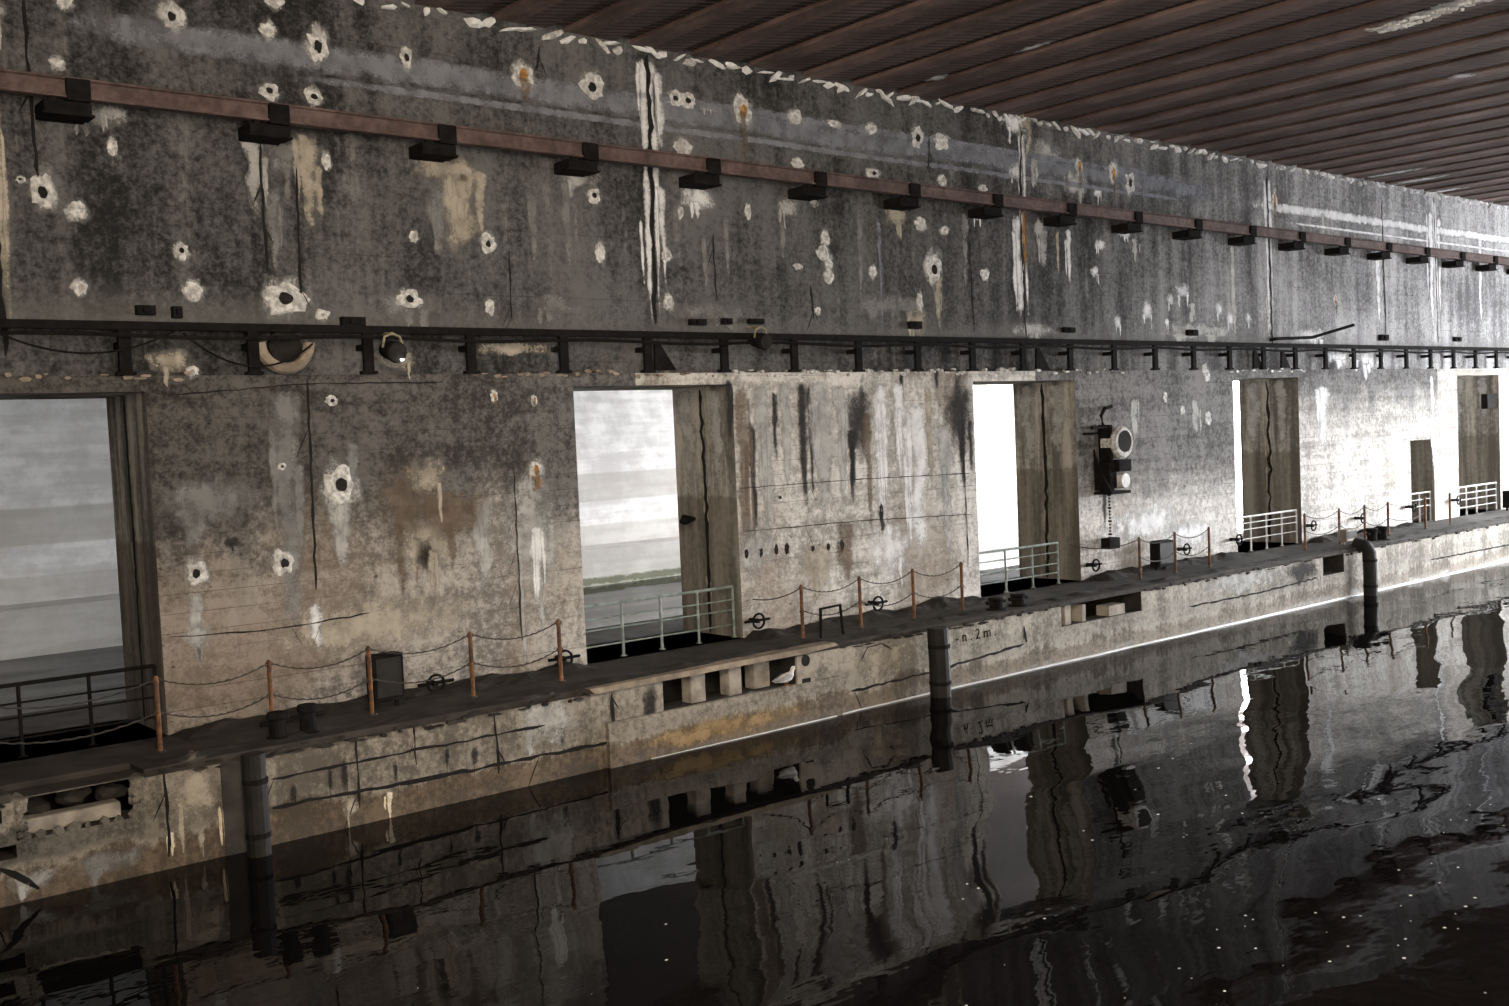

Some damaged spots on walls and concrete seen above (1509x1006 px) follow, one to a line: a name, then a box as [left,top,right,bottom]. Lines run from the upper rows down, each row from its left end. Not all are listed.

leakage [94,17,1210,203]
spalling [354,0,1507,222]
leakage [0,134,9,277]
spalling [15,173,88,220]
leakage [241,134,323,266]
spalling [262,278,330,320]
leakage [419,159,486,253]
leakage [561,176,593,262]
spalling [793,229,835,284]
spalling [914,216,949,312]
spalling [320,464,360,506]
leakage [740,371,973,587]